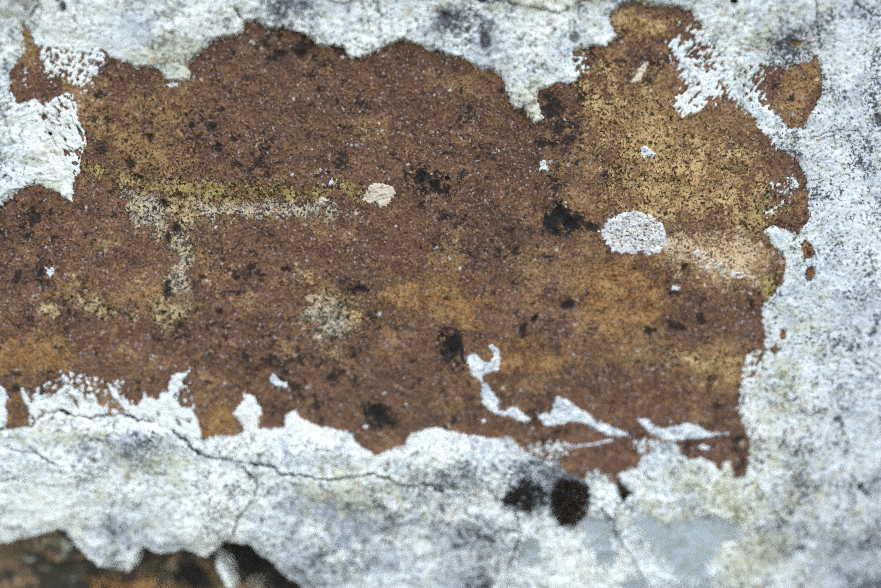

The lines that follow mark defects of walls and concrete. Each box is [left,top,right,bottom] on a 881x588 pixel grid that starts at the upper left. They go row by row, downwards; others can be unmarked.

crack [478,0,581,14]
spalling [0,0,823,485]
crack [0,409,521,588]
spalling [0,528,302,588]
crack [590,503,643,581]